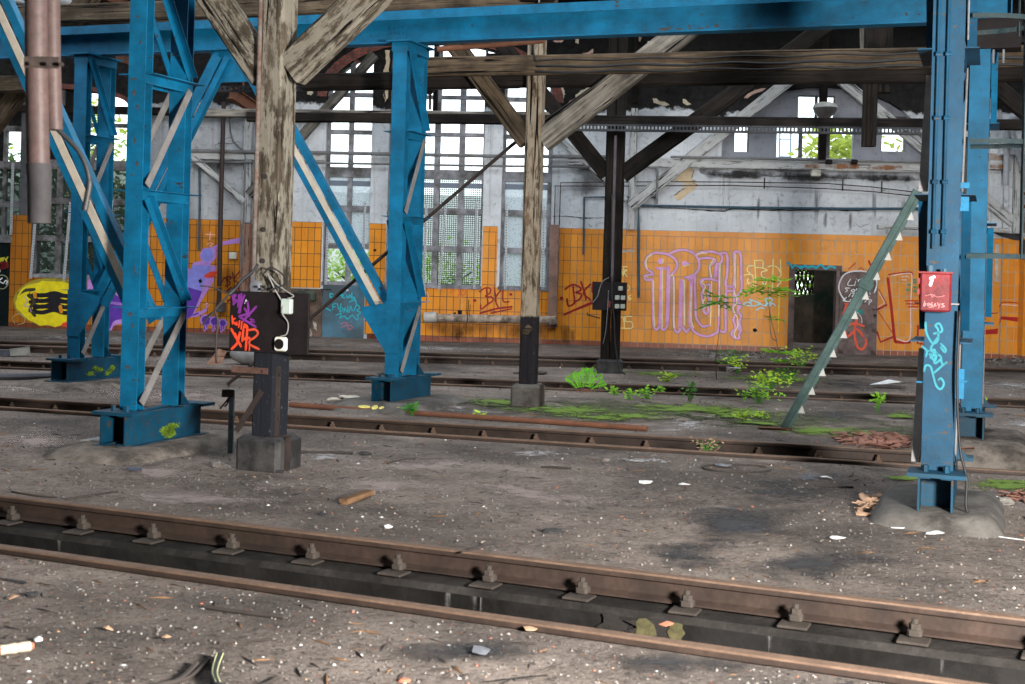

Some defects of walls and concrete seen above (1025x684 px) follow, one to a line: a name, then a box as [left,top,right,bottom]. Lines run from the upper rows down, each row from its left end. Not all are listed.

flaking render [674,168,697,201]